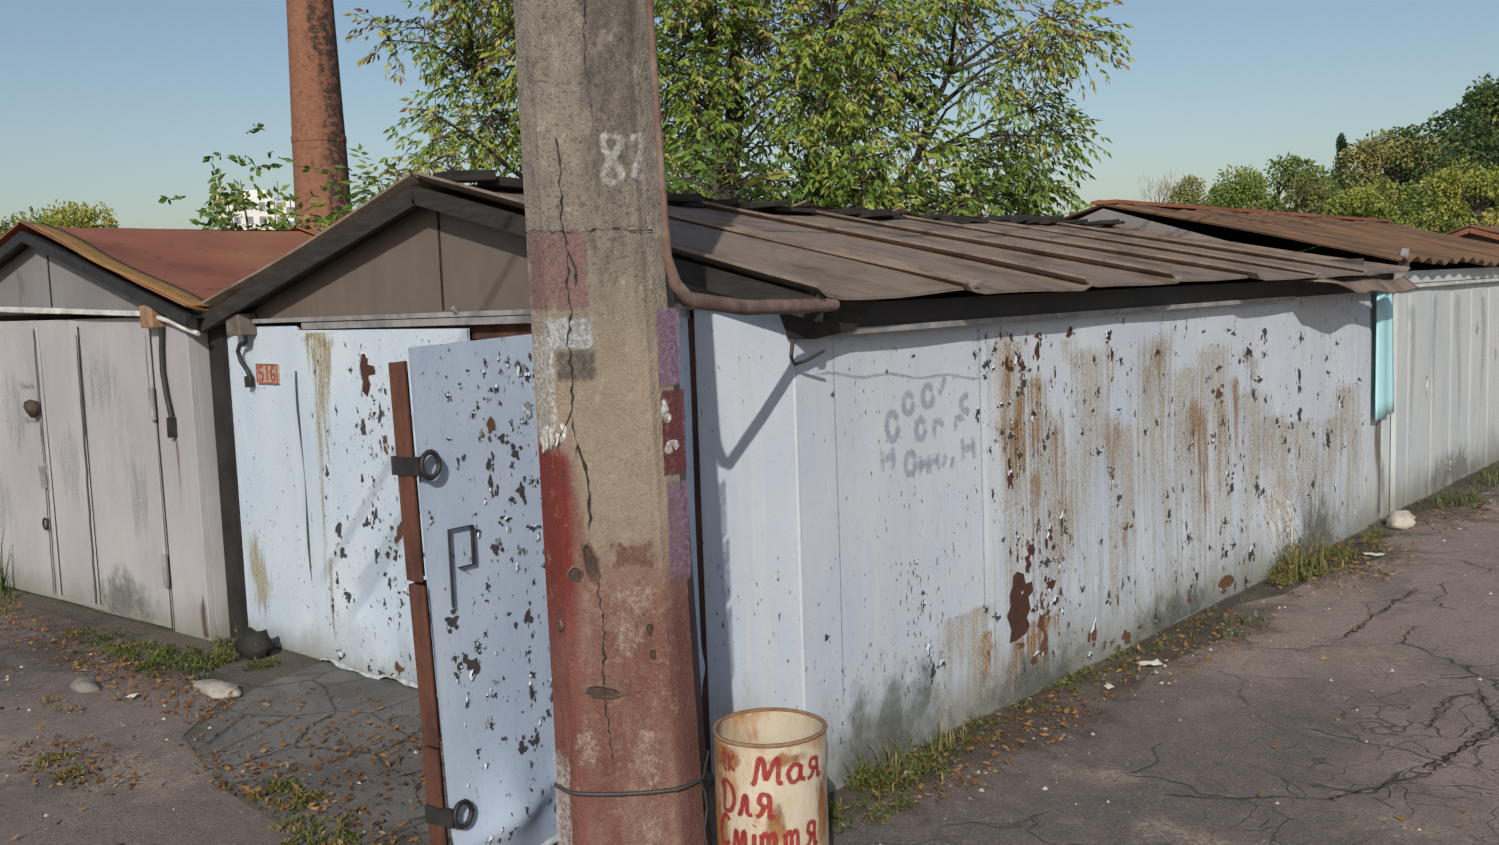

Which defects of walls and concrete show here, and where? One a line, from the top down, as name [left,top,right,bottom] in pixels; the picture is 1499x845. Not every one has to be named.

crack [582,1,591,109]
crack [524,137,653,527]
peeling [310,342,415,642]
corrosion [1002,347,1058,520]
corrosion [1187,405,1208,505]
peeling [414,340,553,845]
peeling [566,538,656,660]
peeling [367,653,411,678]
peeling [575,732,599,766]
spalling [580,683,627,700]
peeling [627,722,663,845]